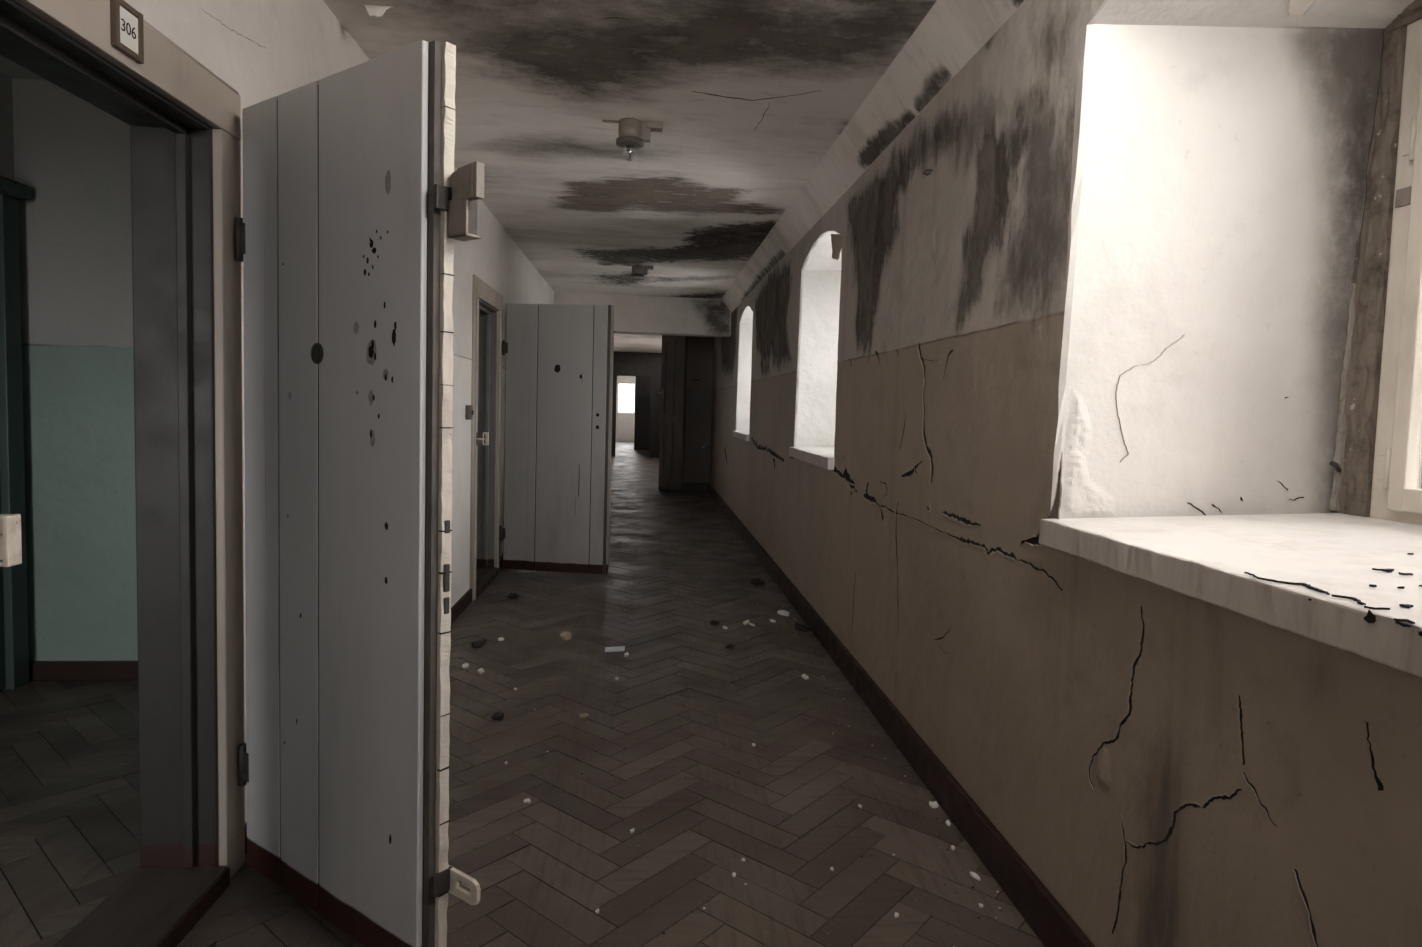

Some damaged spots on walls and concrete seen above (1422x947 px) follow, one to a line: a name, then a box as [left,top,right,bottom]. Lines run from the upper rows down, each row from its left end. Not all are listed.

water stain [557,177,782,285]
water stain [721,250,792,375]
crack [724,343,1063,636]
water stain [849,70,959,353]
water stain [957,124,1072,327]
flaking render [1019,387,1118,548]
crack [1115,335,1185,463]
water stain [1311,31,1378,447]
crack [1244,553,1422,624]
crack [1088,606,1145,790]
crack [1111,695,1276,934]
crack [1366,722,1384,791]